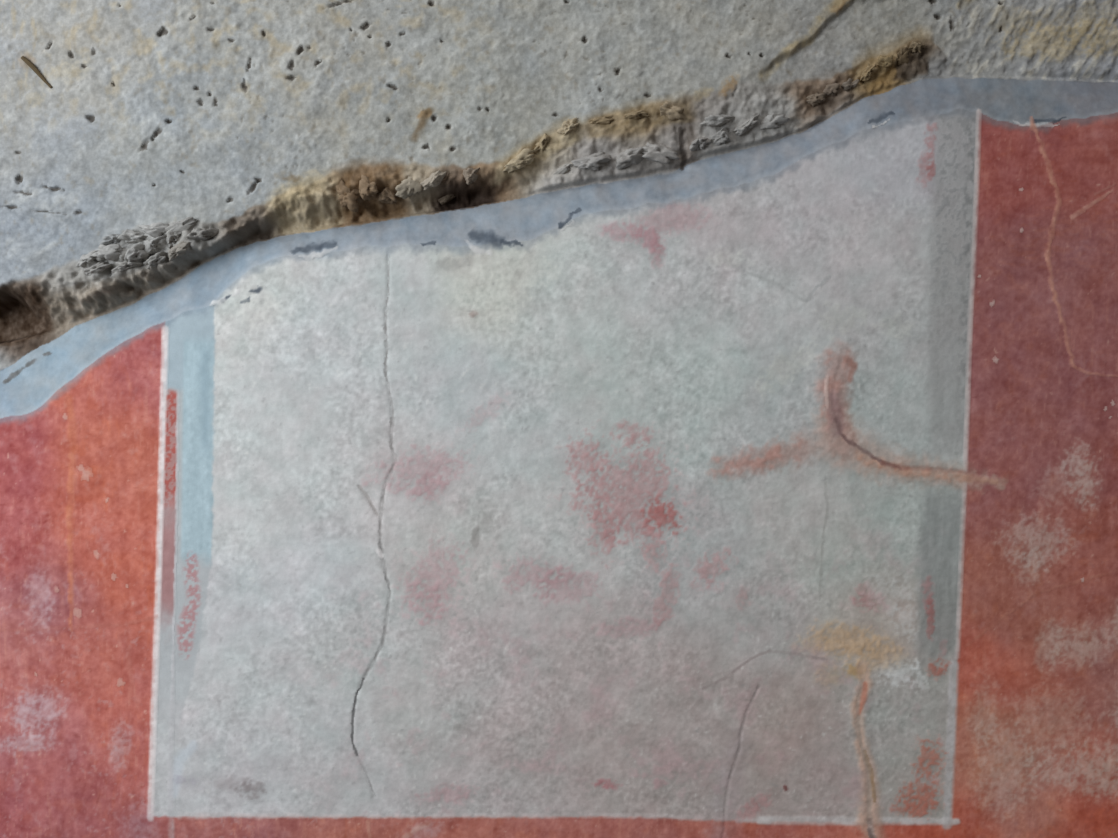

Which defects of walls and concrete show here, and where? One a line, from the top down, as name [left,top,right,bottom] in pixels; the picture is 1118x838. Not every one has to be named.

spalling [0,174,83,216]
spalling [68,47,97,69]
spalling [41,217,219,333]
spalling [140,119,172,153]
spalling [193,86,218,106]
spalling [247,178,269,197]
spalling [263,0,956,261]
crack [1026,116,1118,377]
spalling [1,351,53,385]
crack [350,253,398,796]
crack [700,333,1011,601]
crack [702,648,891,838]